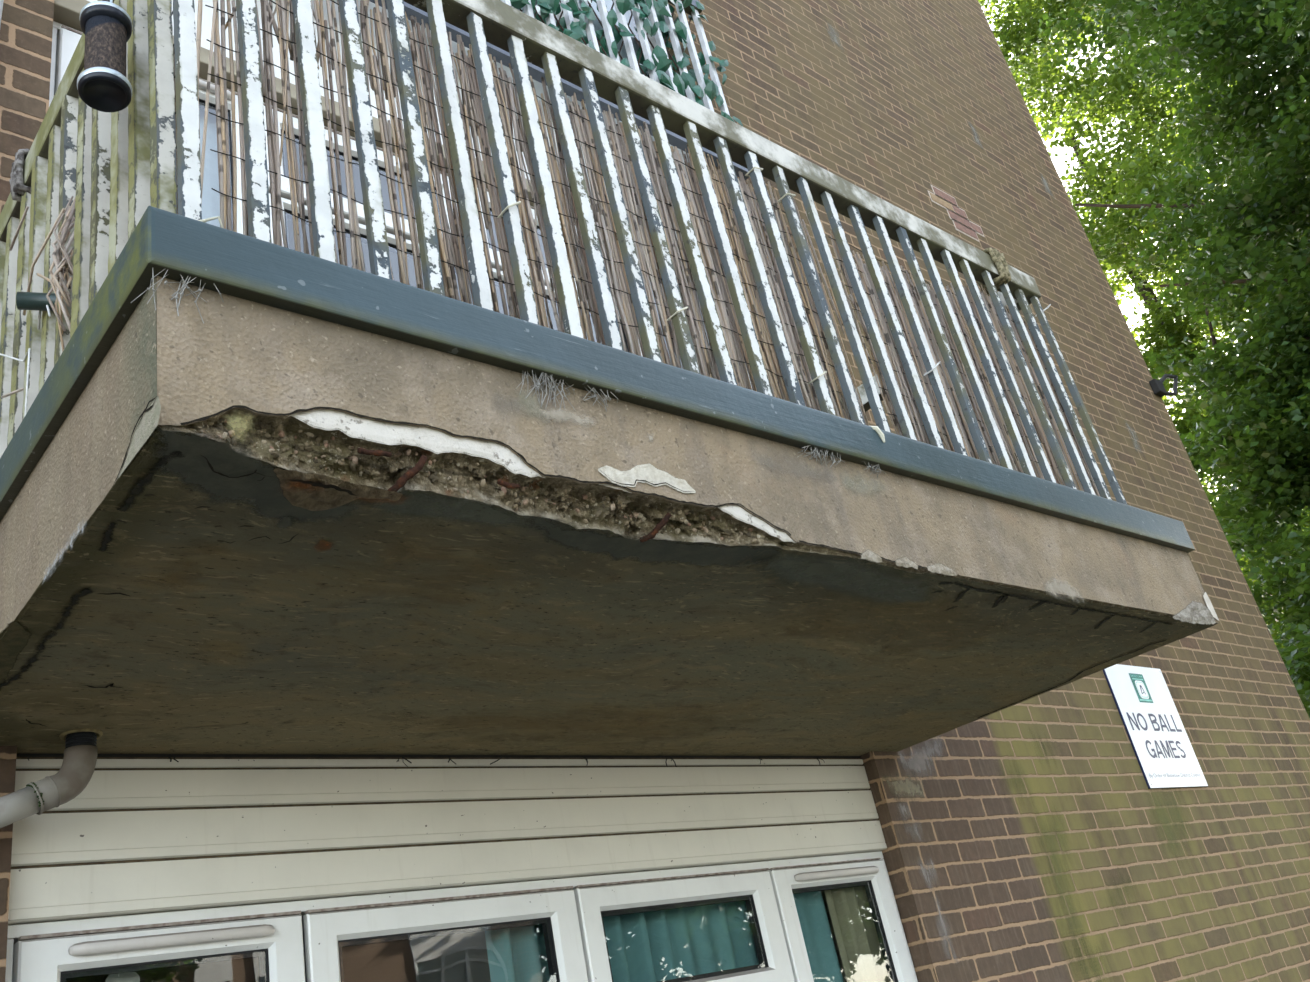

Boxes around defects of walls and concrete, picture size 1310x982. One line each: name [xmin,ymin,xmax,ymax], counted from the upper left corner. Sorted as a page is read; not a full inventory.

spalling [112,396,1219,625]